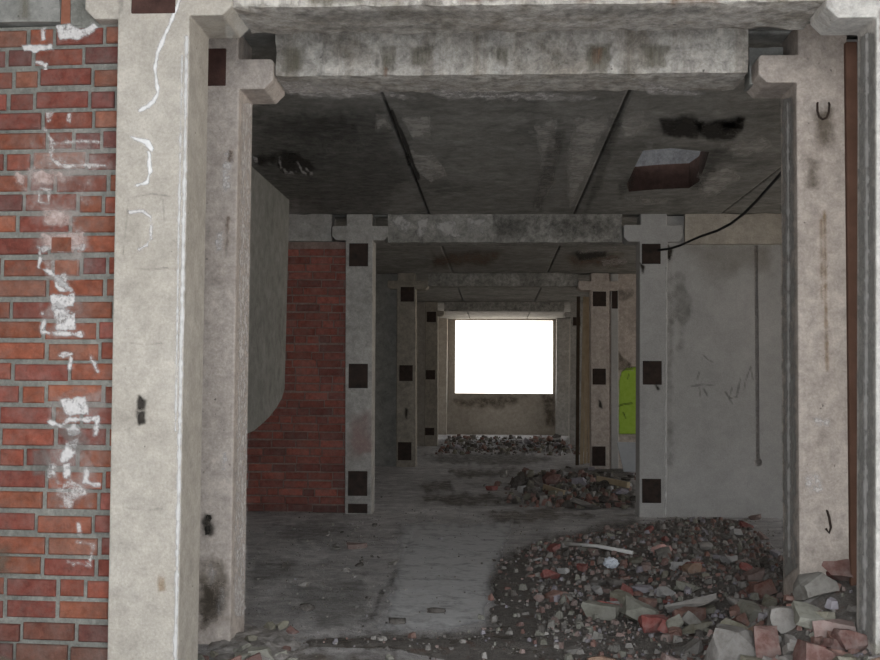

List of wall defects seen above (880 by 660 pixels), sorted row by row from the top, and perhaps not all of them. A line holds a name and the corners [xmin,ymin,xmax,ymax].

damp [660,116,767,155]
damp [781,98,822,577]